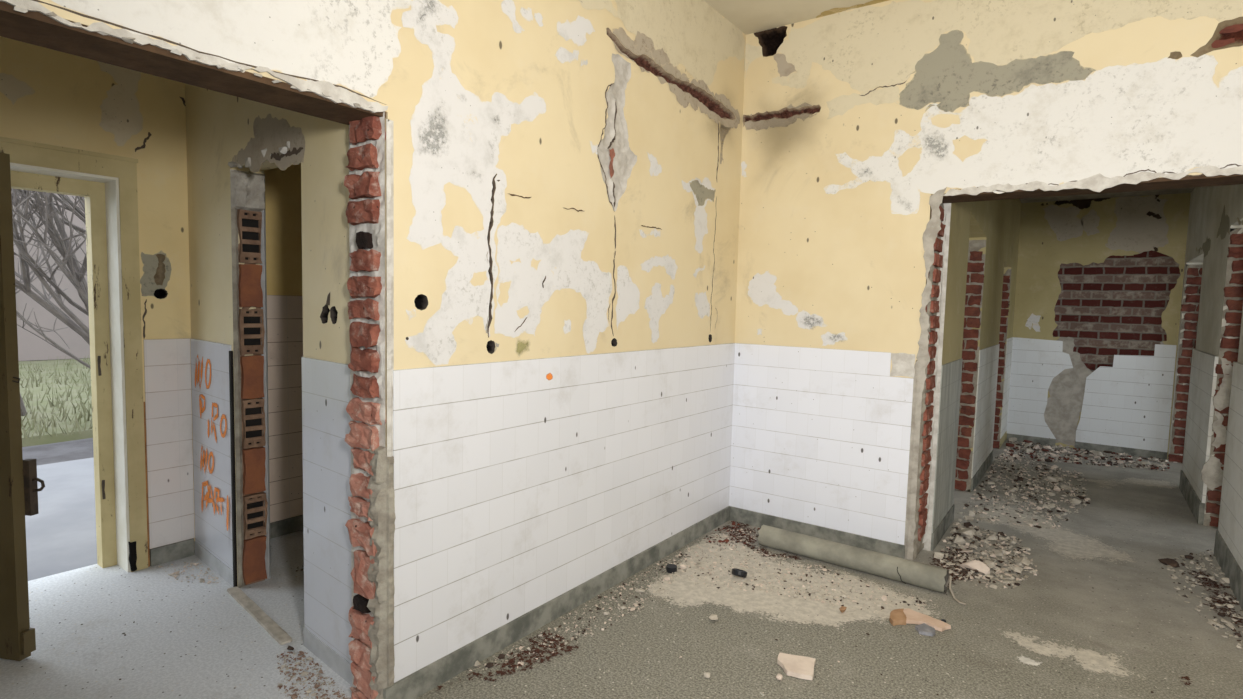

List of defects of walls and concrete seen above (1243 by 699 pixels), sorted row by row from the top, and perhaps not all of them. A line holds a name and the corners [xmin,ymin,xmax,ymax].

spalling [228,114,305,588]
peeling [0,0,678,366]
flaking render [345,249,386,699]
crack [485,173,500,351]
crack [597,83,617,336]
crack [710,123,731,328]
peeling [501,0,1243,561]